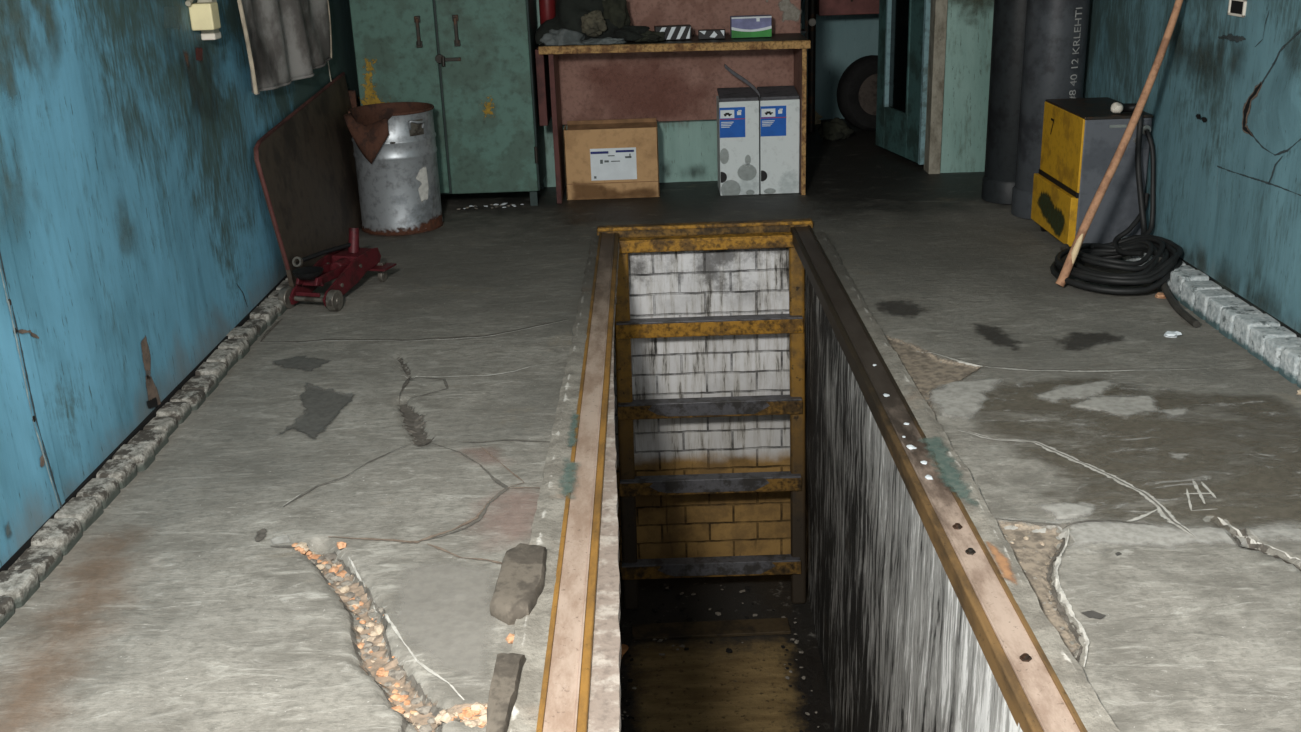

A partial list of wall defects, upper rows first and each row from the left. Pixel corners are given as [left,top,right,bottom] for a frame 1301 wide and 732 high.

water stain [0,0,55,94]
crack [1217,12,1301,196]
spalling [274,356,353,439]
crack [255,319,566,732]
crack [959,430,1301,667]
spalling [997,503,1301,659]